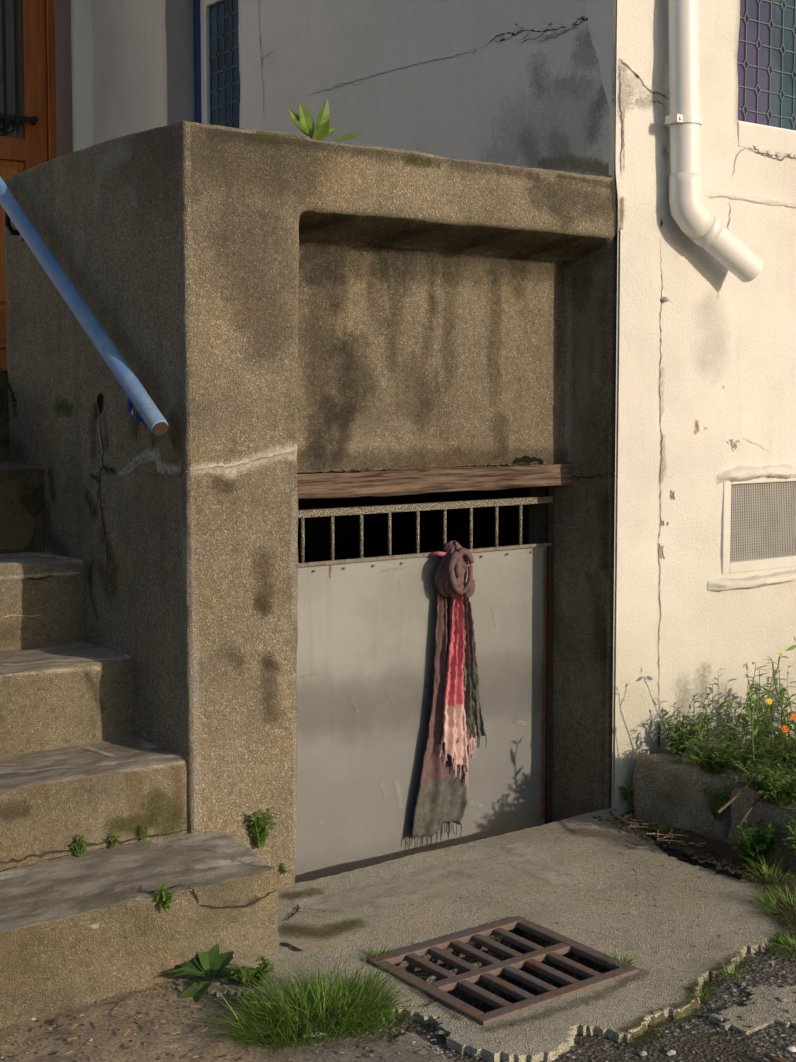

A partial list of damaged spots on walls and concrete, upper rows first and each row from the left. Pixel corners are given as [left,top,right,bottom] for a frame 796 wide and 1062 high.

crack [307,16,588,96]
crack [612,52,669,175]
crack [733,145,796,173]
crack [85,416,115,586]
crack [0,830,188,872]
crack [149,885,277,909]